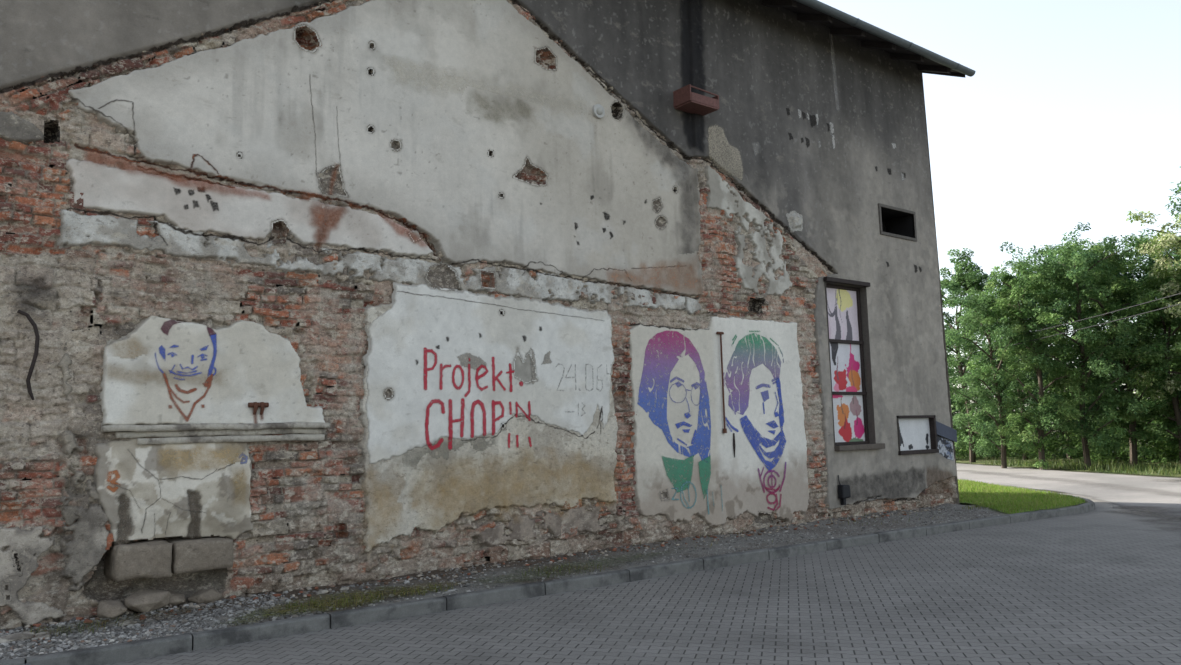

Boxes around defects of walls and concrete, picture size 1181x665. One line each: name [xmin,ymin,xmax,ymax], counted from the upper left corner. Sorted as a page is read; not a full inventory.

spalling [0,0,370,121]
spalling [534,46,557,71]
spalling [786,108,835,149]
corrosion [302,194,351,244]
spalling [0,138,640,605]
spalling [699,125,958,520]